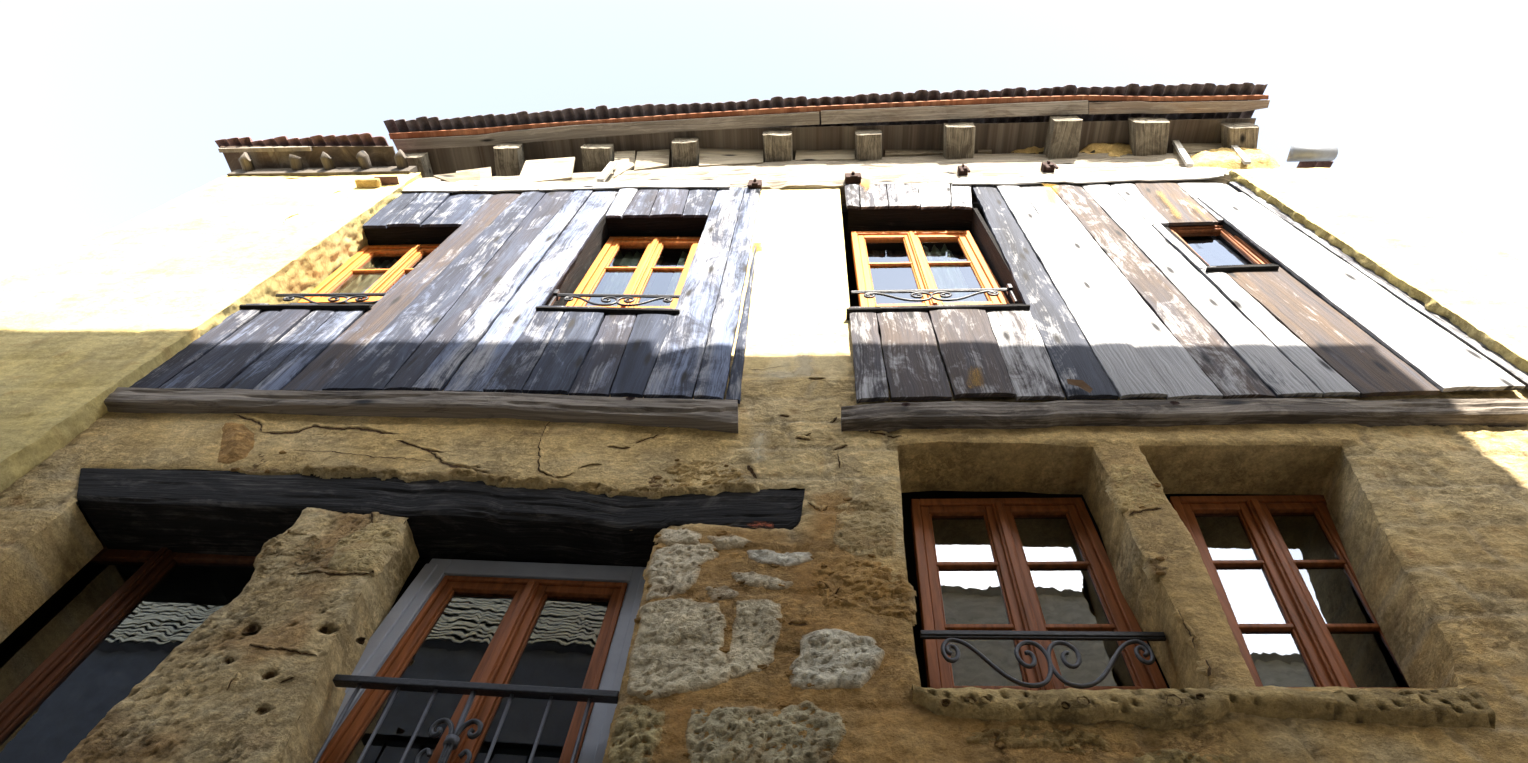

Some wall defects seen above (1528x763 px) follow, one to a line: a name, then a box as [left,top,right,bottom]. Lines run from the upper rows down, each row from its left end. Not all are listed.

crack [235,414,497,474]
crack [537,421,669,478]
spalling [605,496,917,763]